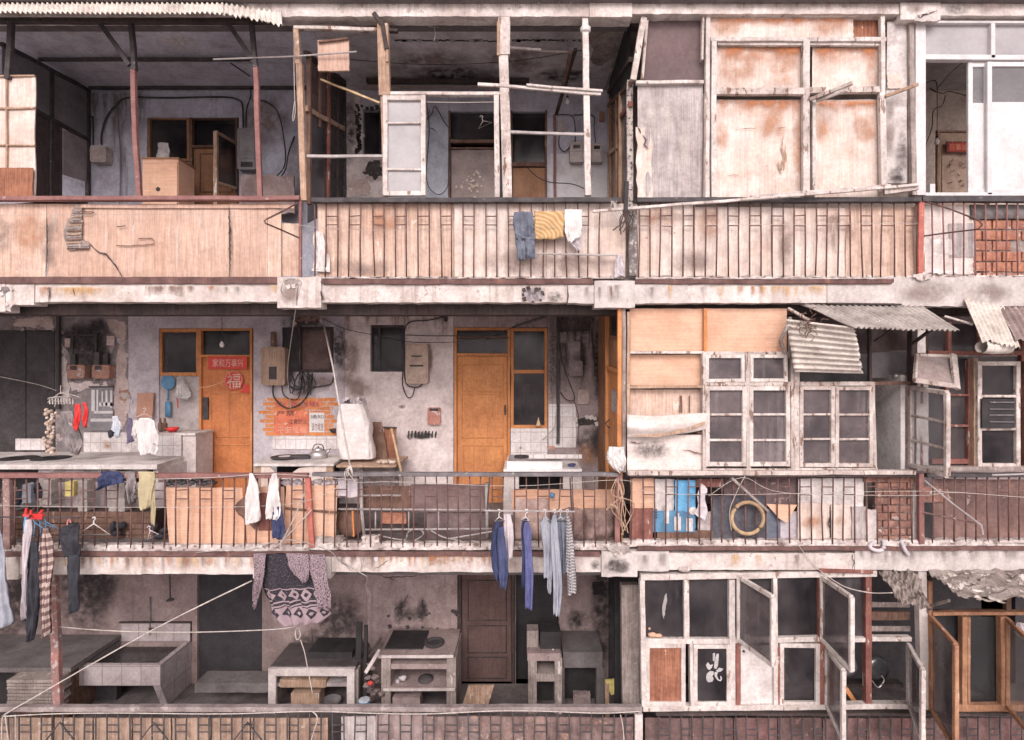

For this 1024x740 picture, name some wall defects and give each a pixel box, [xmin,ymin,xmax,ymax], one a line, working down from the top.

corrosion [723,47,799,71]
corrosion [816,48,877,66]
corrosion [720,100,798,133]
crack [83,240,122,277]
flaking render [61,319,133,429]
leakage [394,594,426,623]